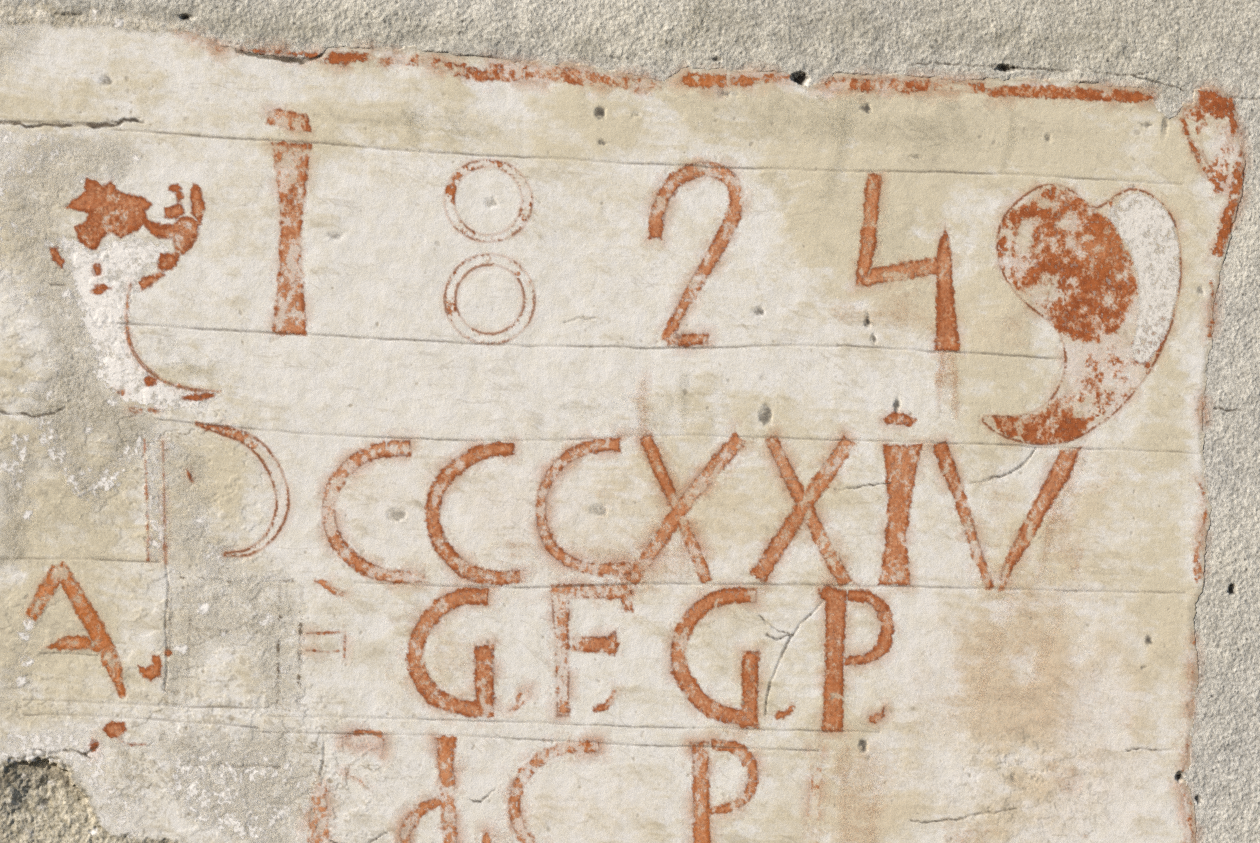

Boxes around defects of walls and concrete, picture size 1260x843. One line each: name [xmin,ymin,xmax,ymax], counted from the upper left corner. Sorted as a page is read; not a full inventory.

spalling [0,0,182,32]
crack [12,118,139,129]
spalling [0,754,172,843]
peeling [173,745,310,842]